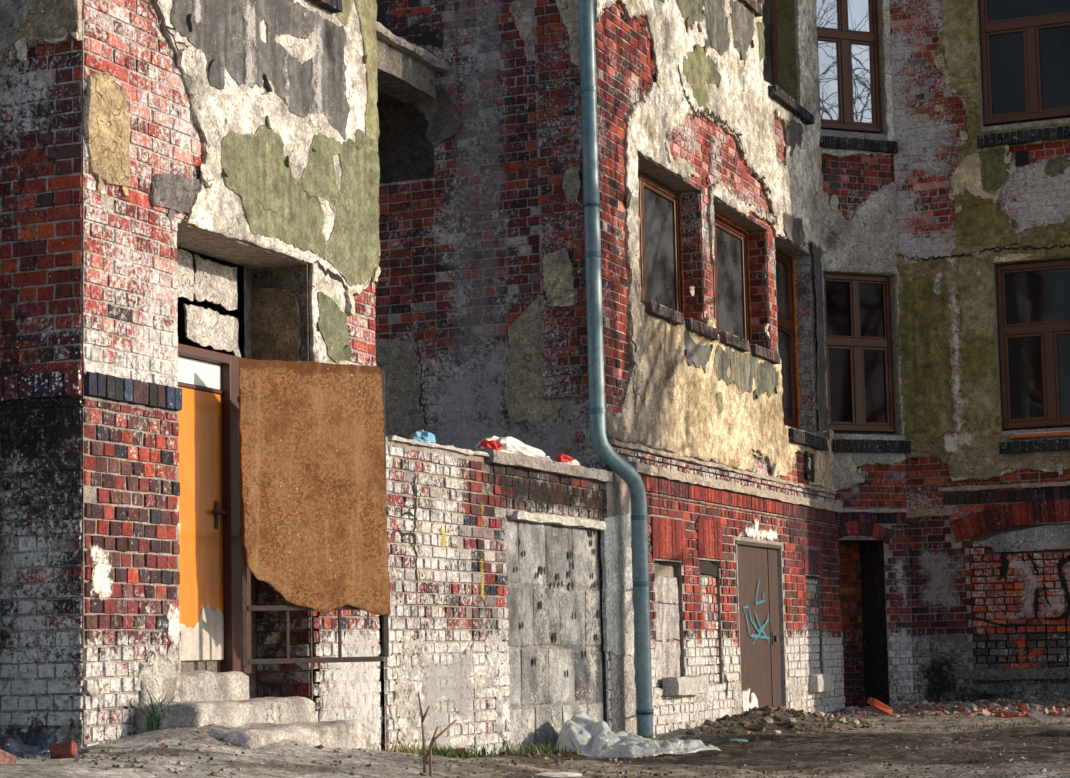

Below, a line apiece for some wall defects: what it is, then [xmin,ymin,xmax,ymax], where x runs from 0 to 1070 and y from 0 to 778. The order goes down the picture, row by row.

flaking render [0,0,606,492]
flaking render [595,0,663,418]
flaking render [660,0,832,440]
flaking render [751,446,811,493]
flaking render [821,0,1070,439]
flaking render [831,456,1070,521]
damp [934,272,976,454]